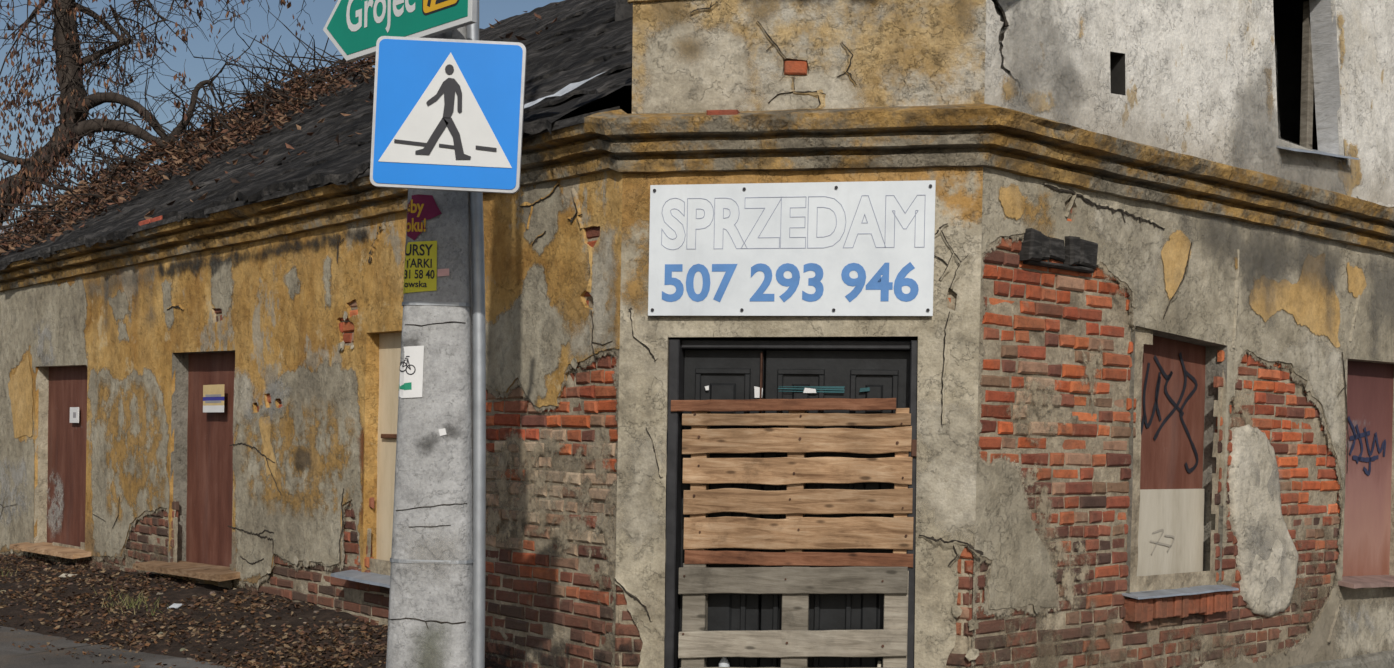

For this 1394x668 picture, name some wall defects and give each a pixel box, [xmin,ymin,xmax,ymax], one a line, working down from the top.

crack [992,0,1022,99]
peeling [0,277,179,577]
peeling [211,257,234,322]
peeling [230,255,391,625]
flaking render [485,173,666,668]
crack [1043,182,1192,319]
flaking render [916,183,1394,668]